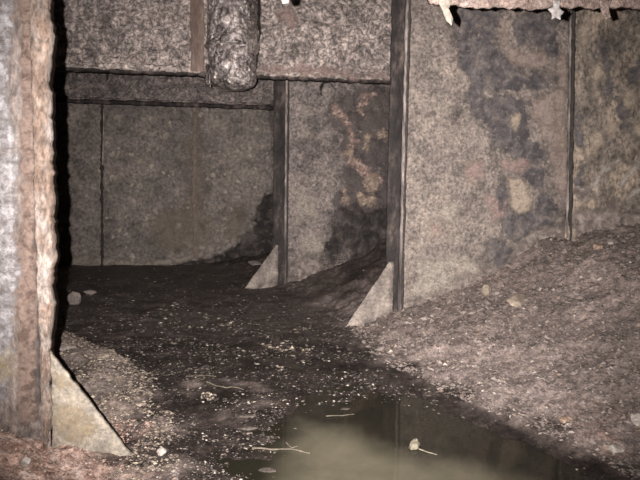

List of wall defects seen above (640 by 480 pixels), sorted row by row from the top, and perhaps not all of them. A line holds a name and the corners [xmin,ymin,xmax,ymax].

damp [288,87,390,281]
damp [409,7,564,306]